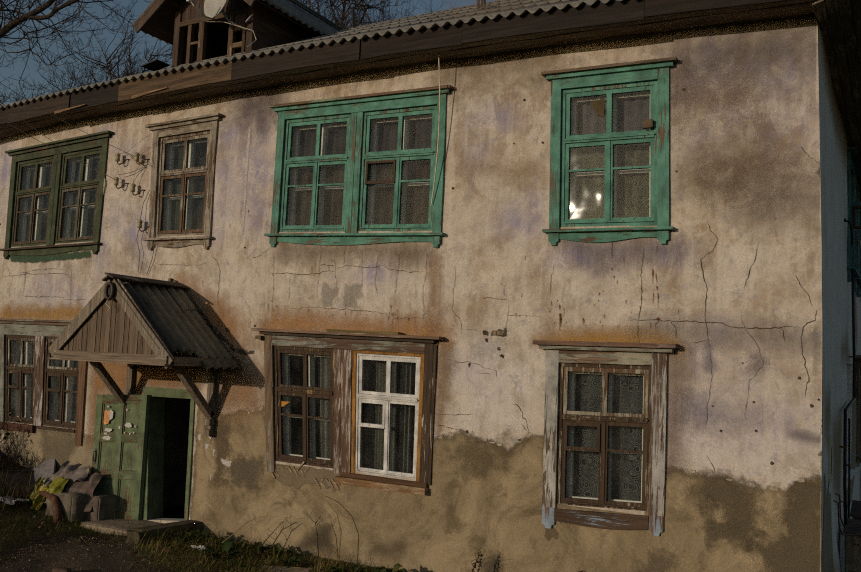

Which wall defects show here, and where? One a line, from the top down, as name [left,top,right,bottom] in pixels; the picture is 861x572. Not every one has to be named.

leakage [263,316,438,336]
crack [637,221,817,425]
peeling [189,407,834,572]
leakage [700,475,820,572]